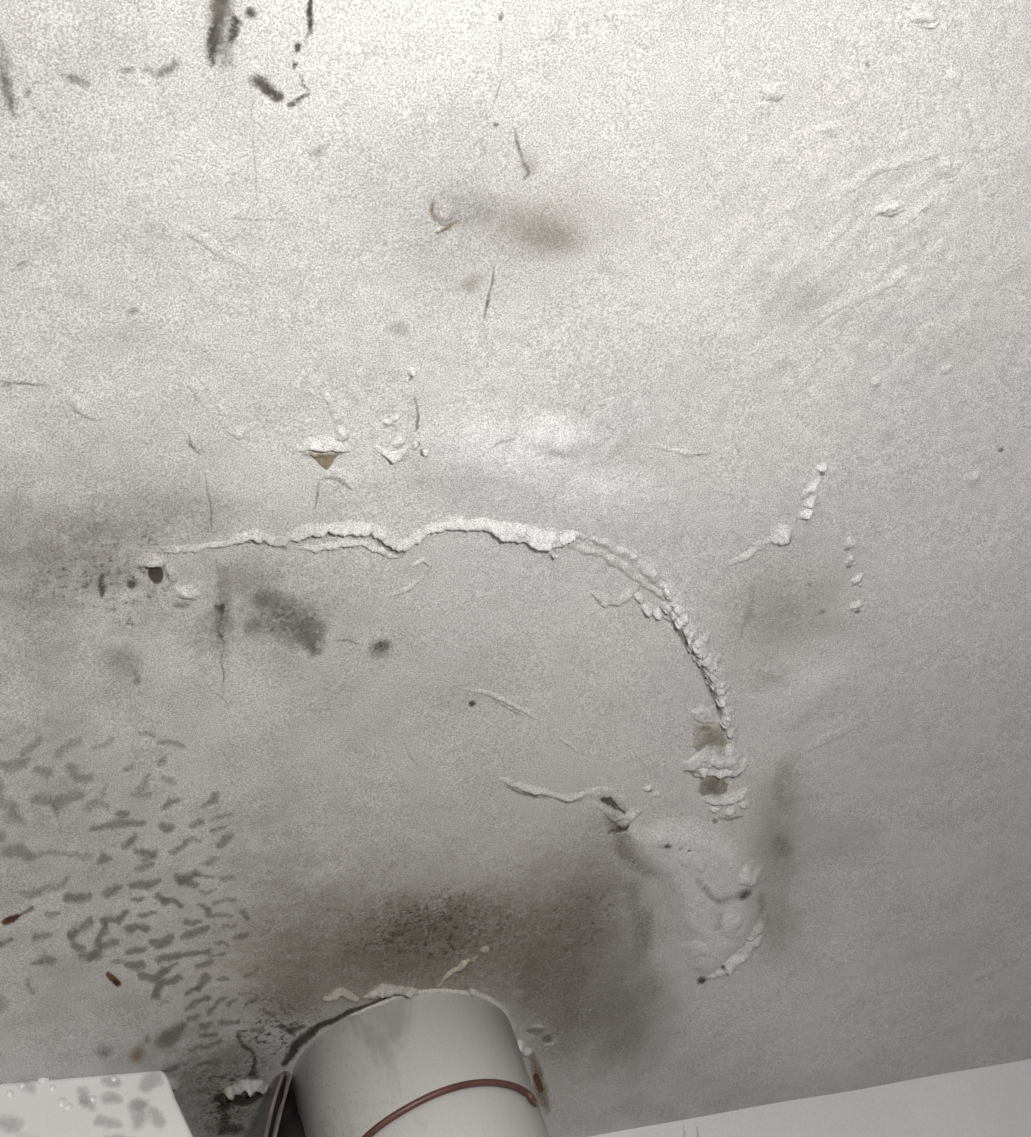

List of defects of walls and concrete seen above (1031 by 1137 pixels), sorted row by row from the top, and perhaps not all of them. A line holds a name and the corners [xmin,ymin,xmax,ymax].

flaking render [296,386,360,494]
peeling [374,413,429,464]
crack [462,687,579,753]
crack [498,777,602,802]
leakage [92,812,155,865]
leakage [67,879,301,1125]